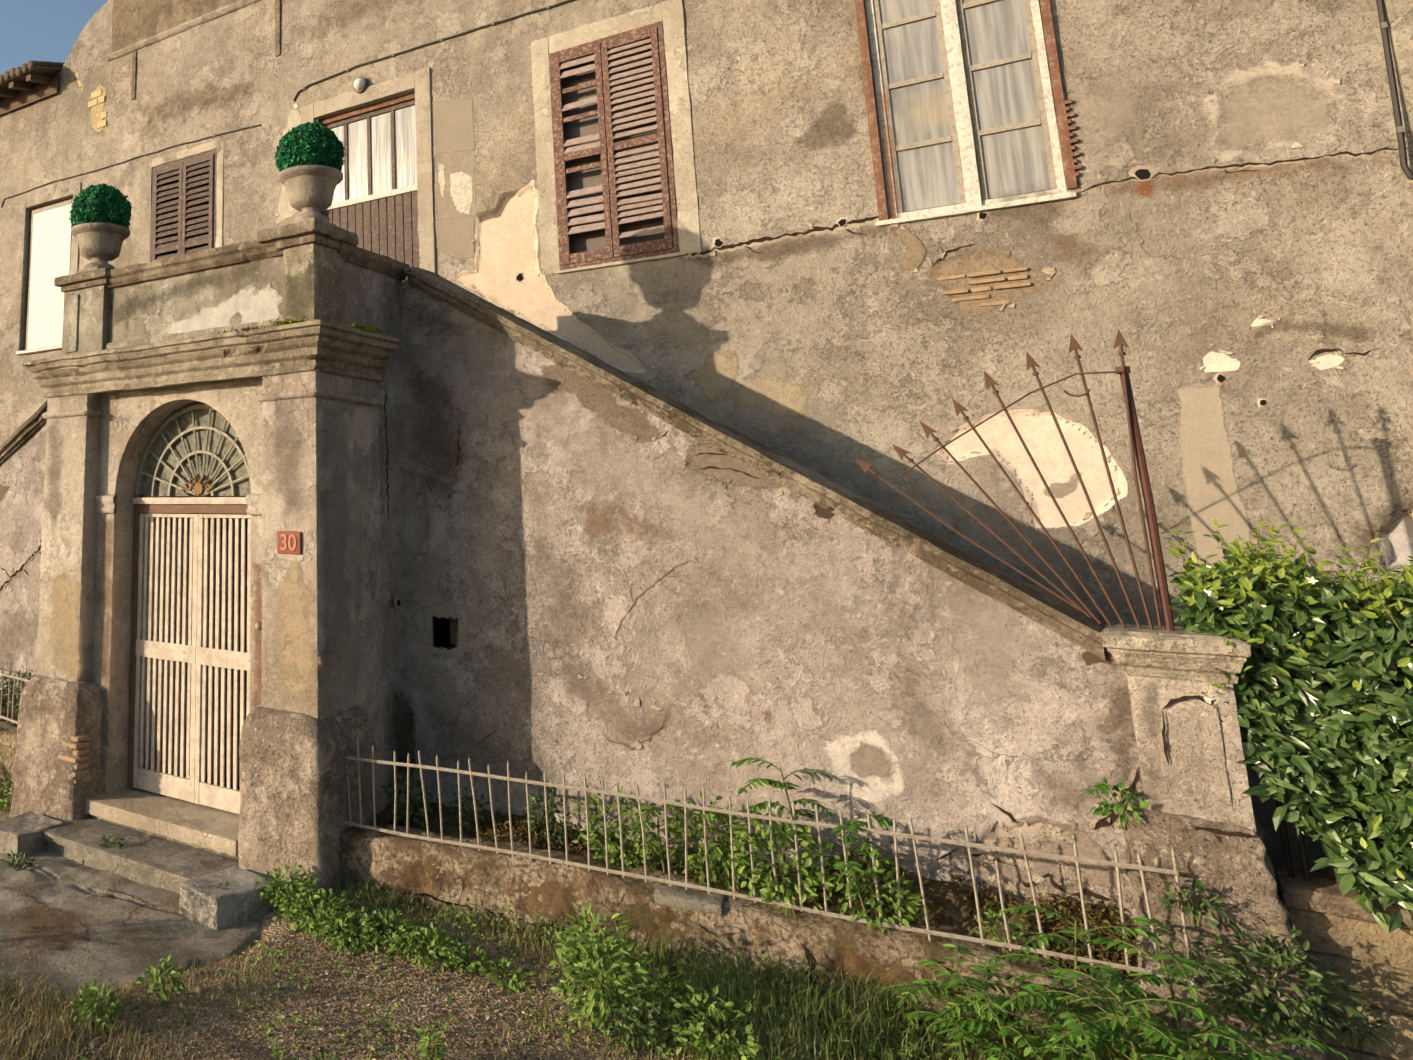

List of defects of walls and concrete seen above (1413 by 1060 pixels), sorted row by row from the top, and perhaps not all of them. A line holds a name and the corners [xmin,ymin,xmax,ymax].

crack [1078,147,1410,195]
spalling [436,149,649,374]
crack [683,216,892,259]
spalling [890,224,1057,316]
spalling [1199,349,1241,385]
spalling [1307,352,1344,371]
spalling [543,365,667,442]
spalling [935,409,1128,529]
crack [0,539,41,595]
crack [1088,695,1218,830]
crack [8,887,198,941]